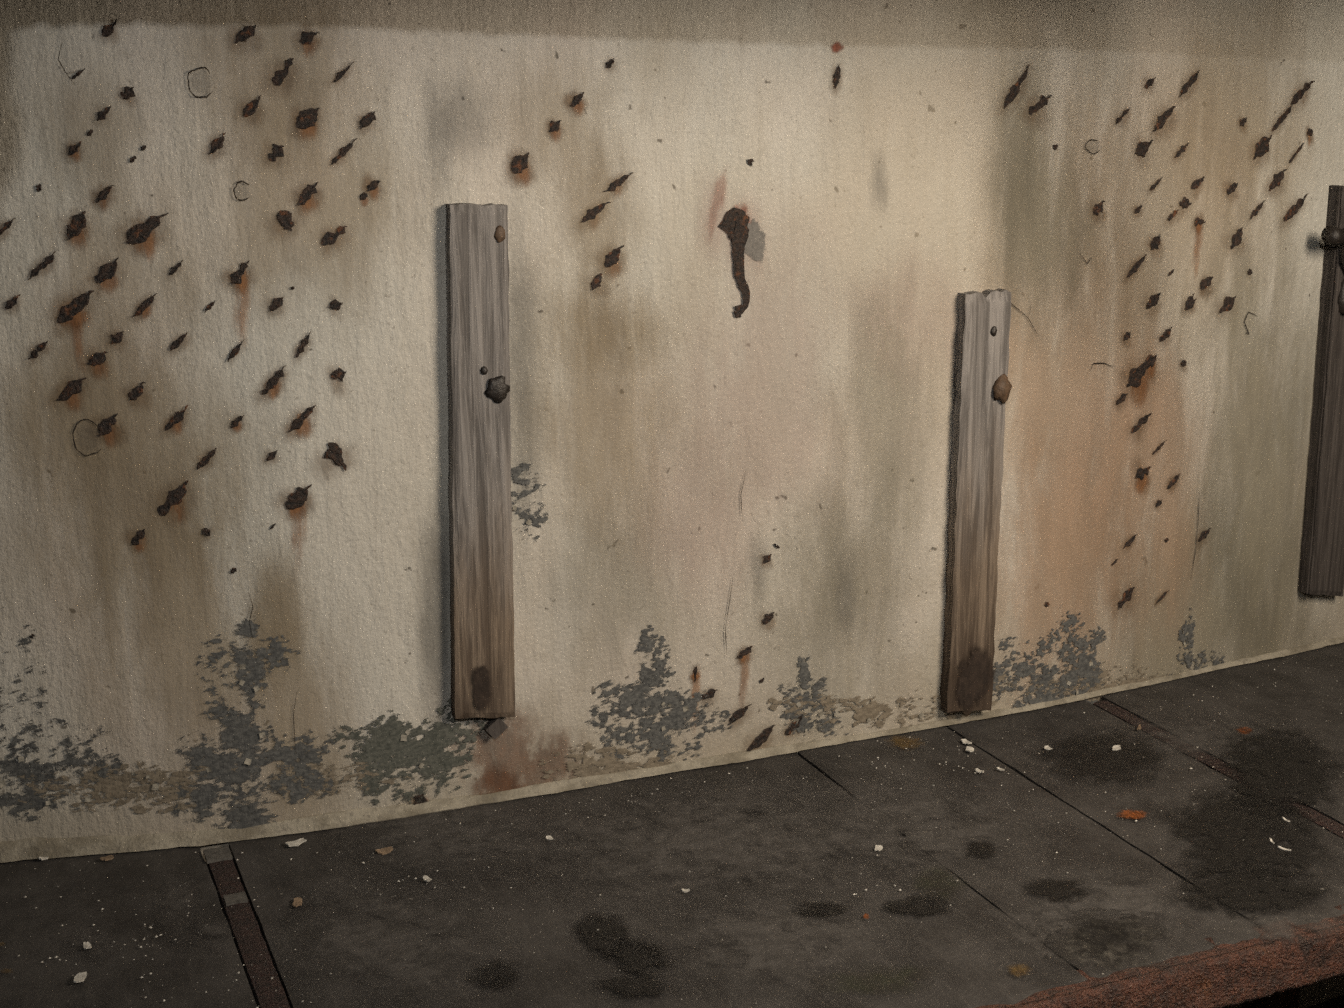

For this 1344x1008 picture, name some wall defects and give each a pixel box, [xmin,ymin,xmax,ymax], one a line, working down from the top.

peeling [0,618,488,841]
peeling [534,624,752,782]
peeling [747,654,966,752]
peeling [992,602,1239,714]
leakage [1173,728,1340,916]
leakage [577,914,669,997]